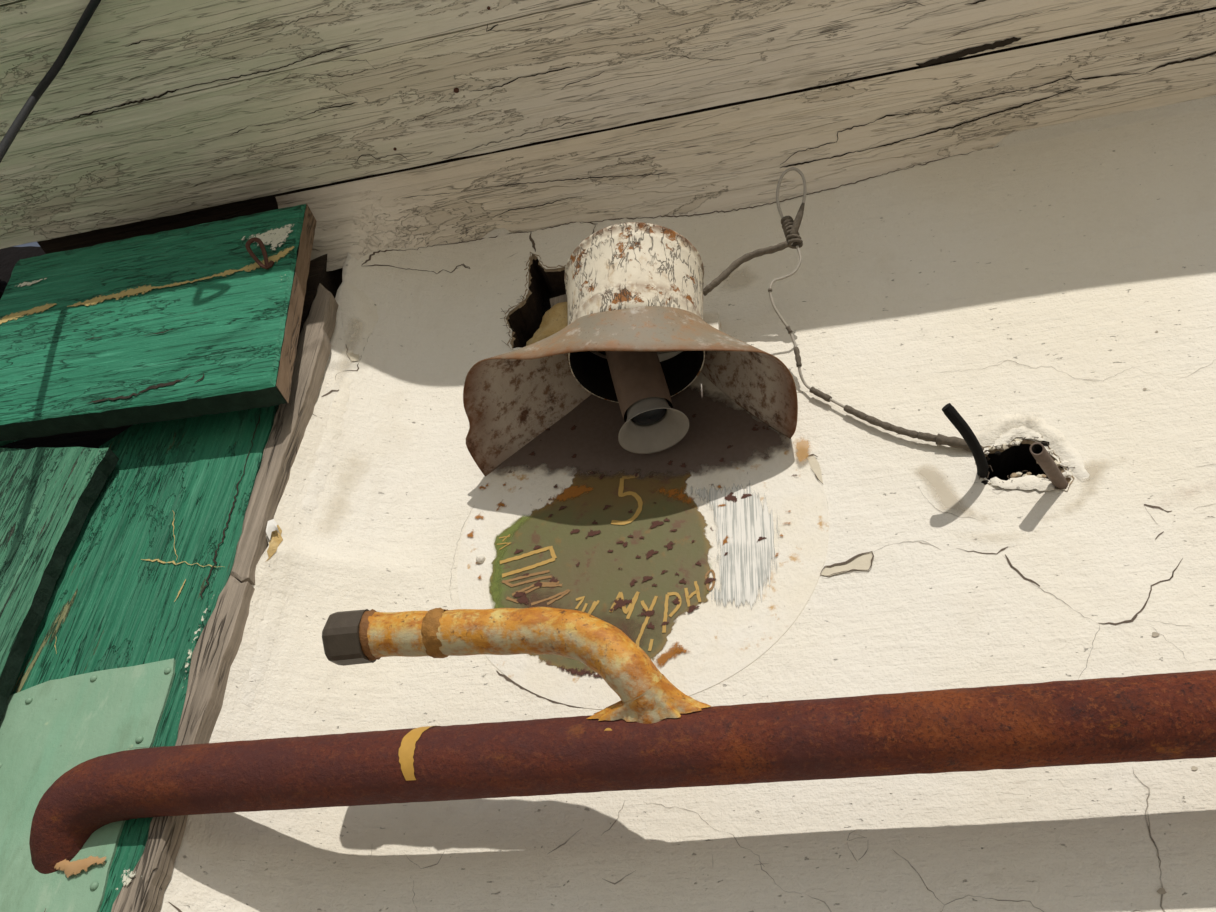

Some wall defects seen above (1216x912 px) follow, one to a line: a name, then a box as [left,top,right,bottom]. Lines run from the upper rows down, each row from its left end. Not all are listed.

crack [916,0,1069,67]
crack [361,51,1216,274]
flaking render [500,252,568,350]
spalling [986,426,1055,491]
flaking render [820,551,874,576]
crack [908,541,1184,675]
crack [1132,771,1165,912]